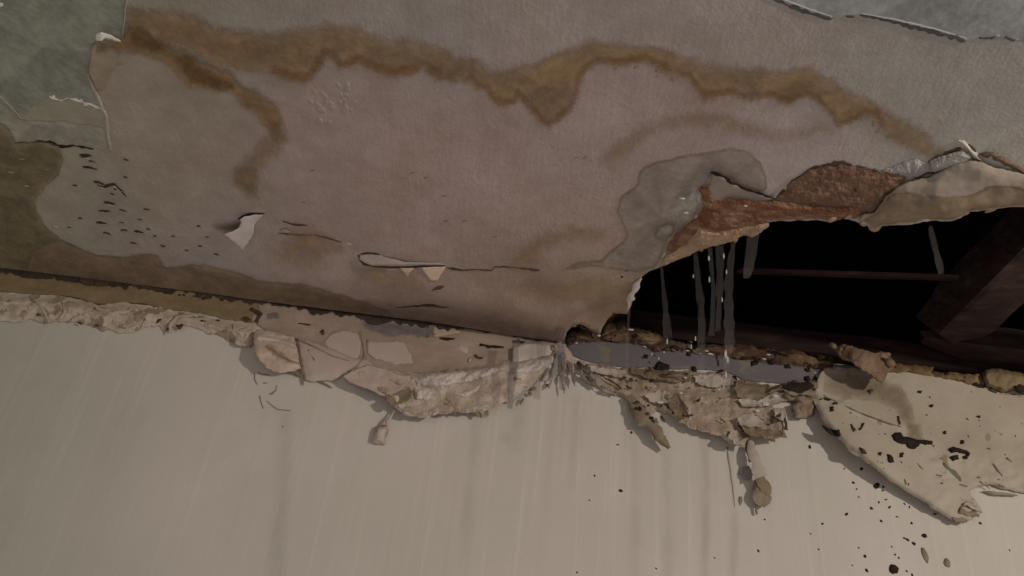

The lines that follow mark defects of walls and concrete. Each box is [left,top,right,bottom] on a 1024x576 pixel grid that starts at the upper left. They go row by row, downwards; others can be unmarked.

peeling [87,0,127,151]
water stain [98,9,940,183]
peeling [220,213,265,250]
crack [0,221,557,377]
flaking render [0,270,1024,394]
flaking render [691,144,1024,232]